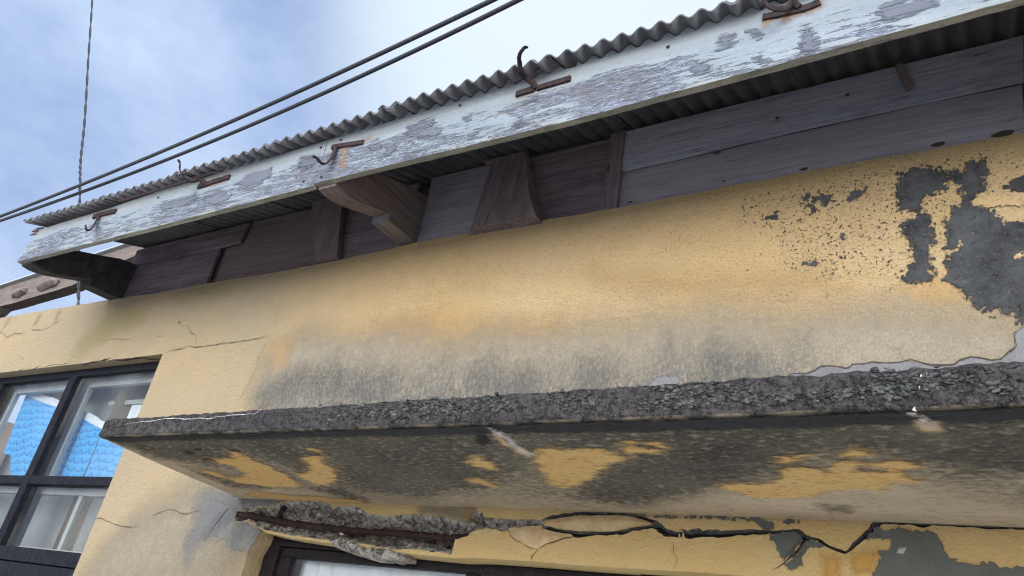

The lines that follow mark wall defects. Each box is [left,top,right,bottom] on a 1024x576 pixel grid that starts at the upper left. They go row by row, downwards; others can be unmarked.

peeling [742,146,1024,377]
crack [1,295,281,424]
leakage [253,308,1019,410]
spalling [212,497,574,565]
leakage [85,407,1024,576]
crack [508,512,1024,570]
peeling [866,526,1024,576]